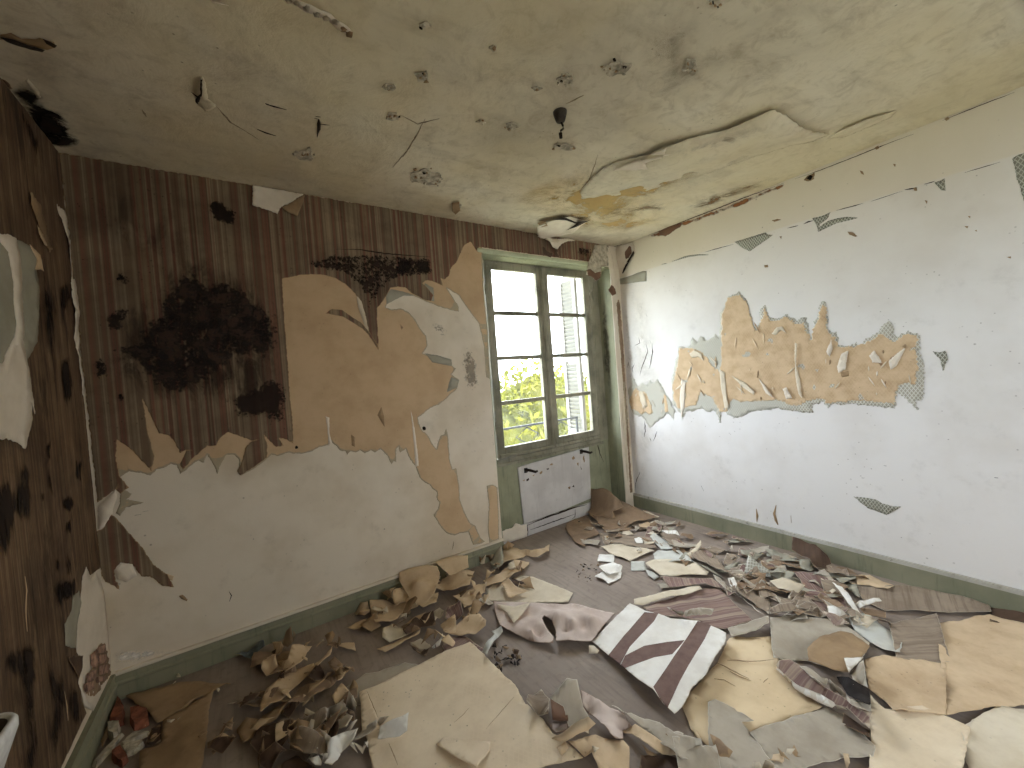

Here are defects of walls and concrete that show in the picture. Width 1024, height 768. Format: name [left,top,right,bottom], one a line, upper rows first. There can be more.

damp [2,79,77,154]
crack [393,115,437,167]
damp [552,182,667,228]
damp [698,186,751,207]
damp [311,253,432,307]
flaking render [0,192,53,449]
damp [107,267,286,421]
peeling [616,291,926,493]
damp [0,467,52,554]
peeling [97,490,117,529]
peeling [114,563,137,582]
flaking render [64,567,111,711]